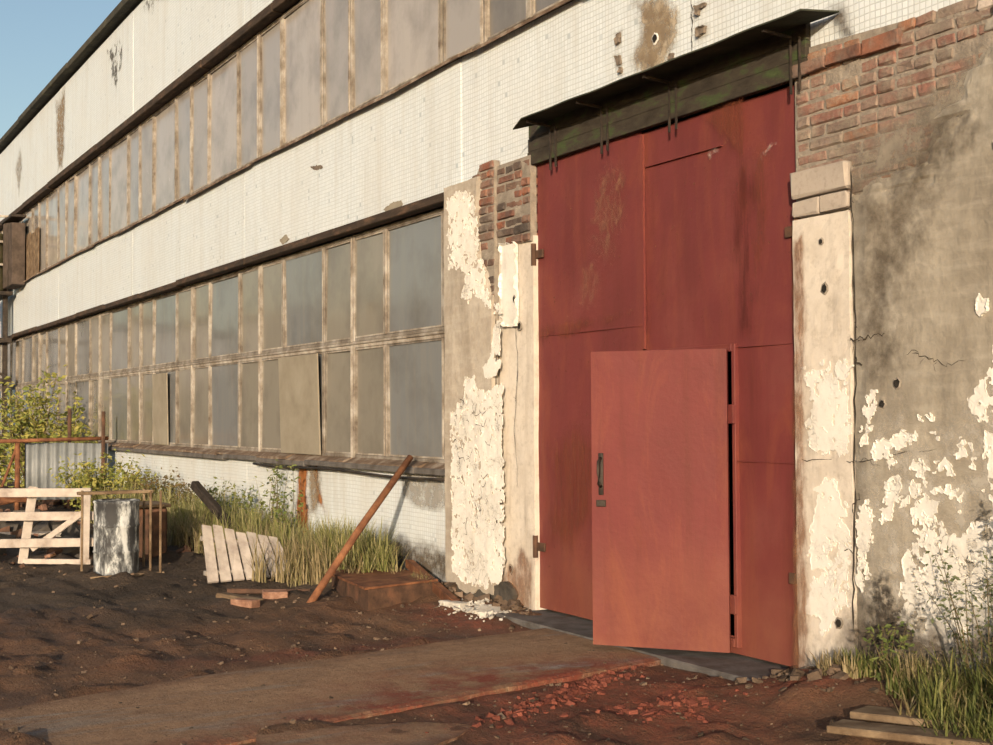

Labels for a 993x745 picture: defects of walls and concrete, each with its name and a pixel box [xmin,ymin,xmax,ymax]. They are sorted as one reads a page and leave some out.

peeling [614,32,623,73]
peeling [635,0,677,70]
spalling [792,0,993,195]
peeling [402,155,538,601]
crack [802,174,935,629]
peeling [975,293,989,317]
corrosion [297,466,322,537]
peeling [801,349,993,650]